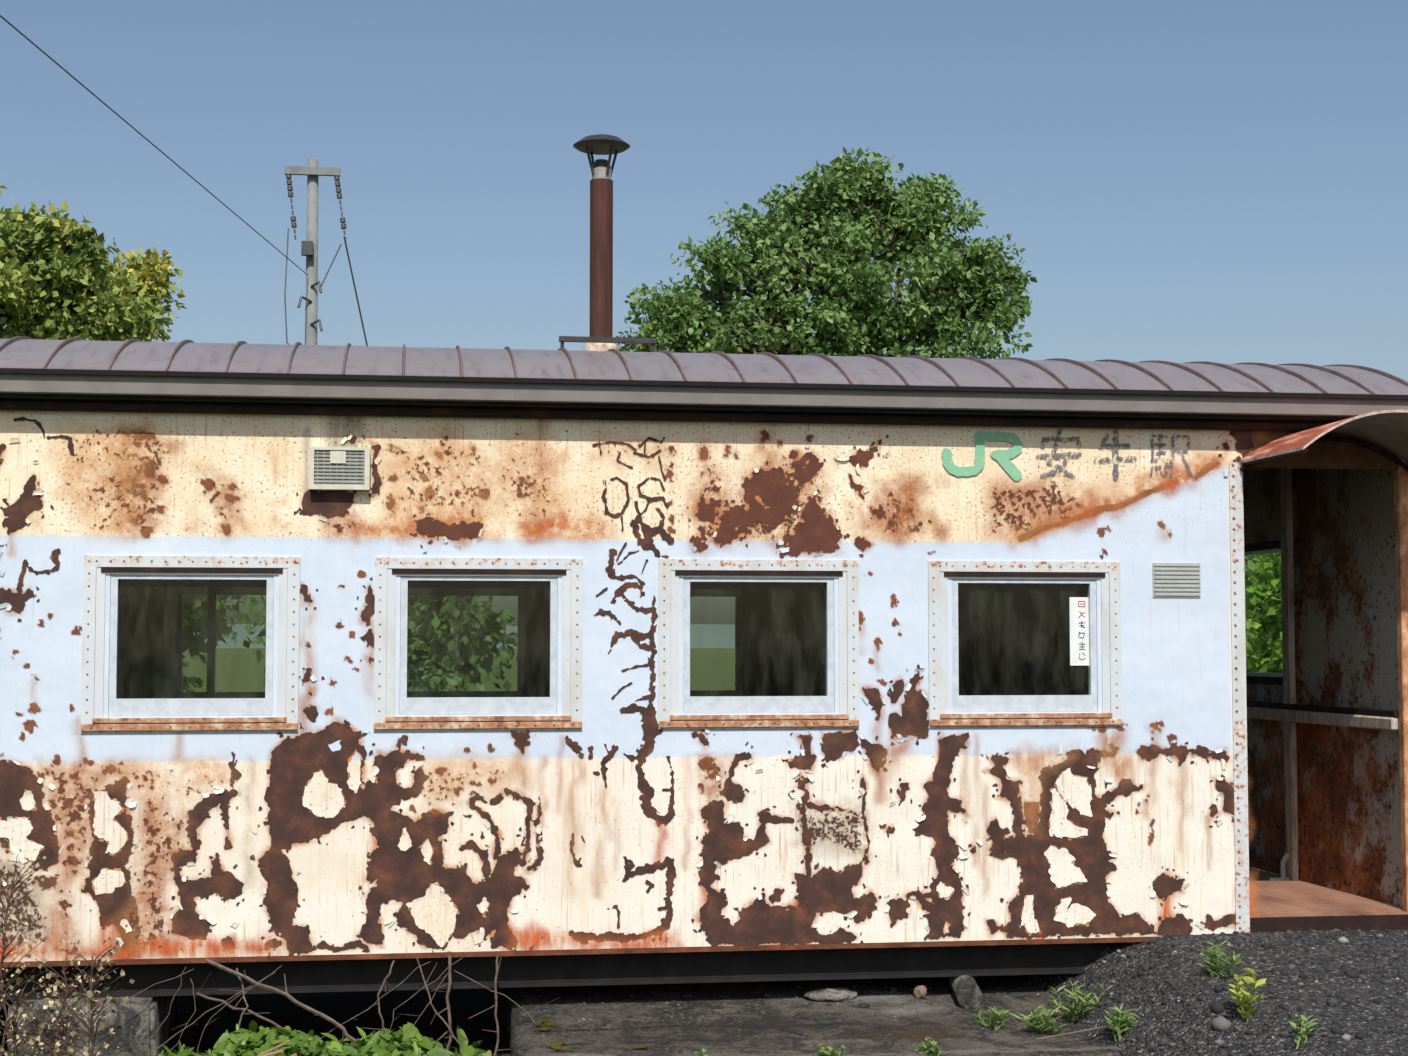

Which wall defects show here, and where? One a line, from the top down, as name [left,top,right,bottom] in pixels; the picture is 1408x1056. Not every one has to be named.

peeling [0,460,54,621]
corrosion [66,429,171,538]
peeling [294,433,383,522]
peeling [410,514,484,553]
corrosion [598,441,676,481]
corrosion [667,429,850,558]
corrosion [990,457,1220,559]
peeling [355,577,375,663]
corrosion [16,703,41,741]
peeling [0,759,150,959]
peeling [168,668,544,956]
peeling [691,664,1236,946]